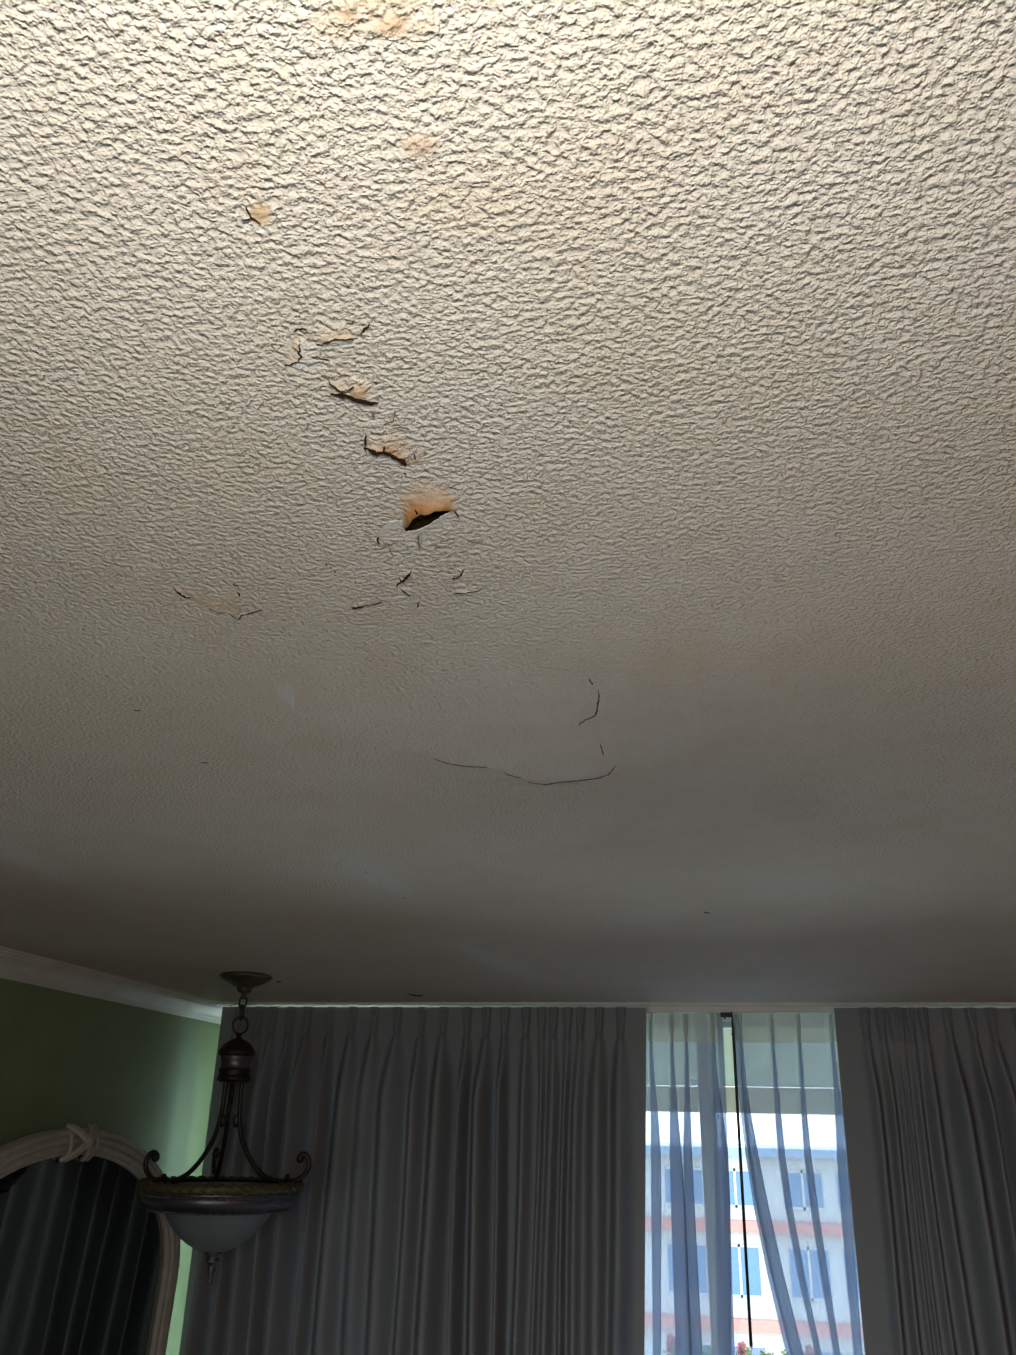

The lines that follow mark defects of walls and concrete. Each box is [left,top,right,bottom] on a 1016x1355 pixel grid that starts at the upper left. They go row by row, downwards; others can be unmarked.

peeling [271,322,435,475]
peeling [378,520,406,543]
crack [430,679,627,786]